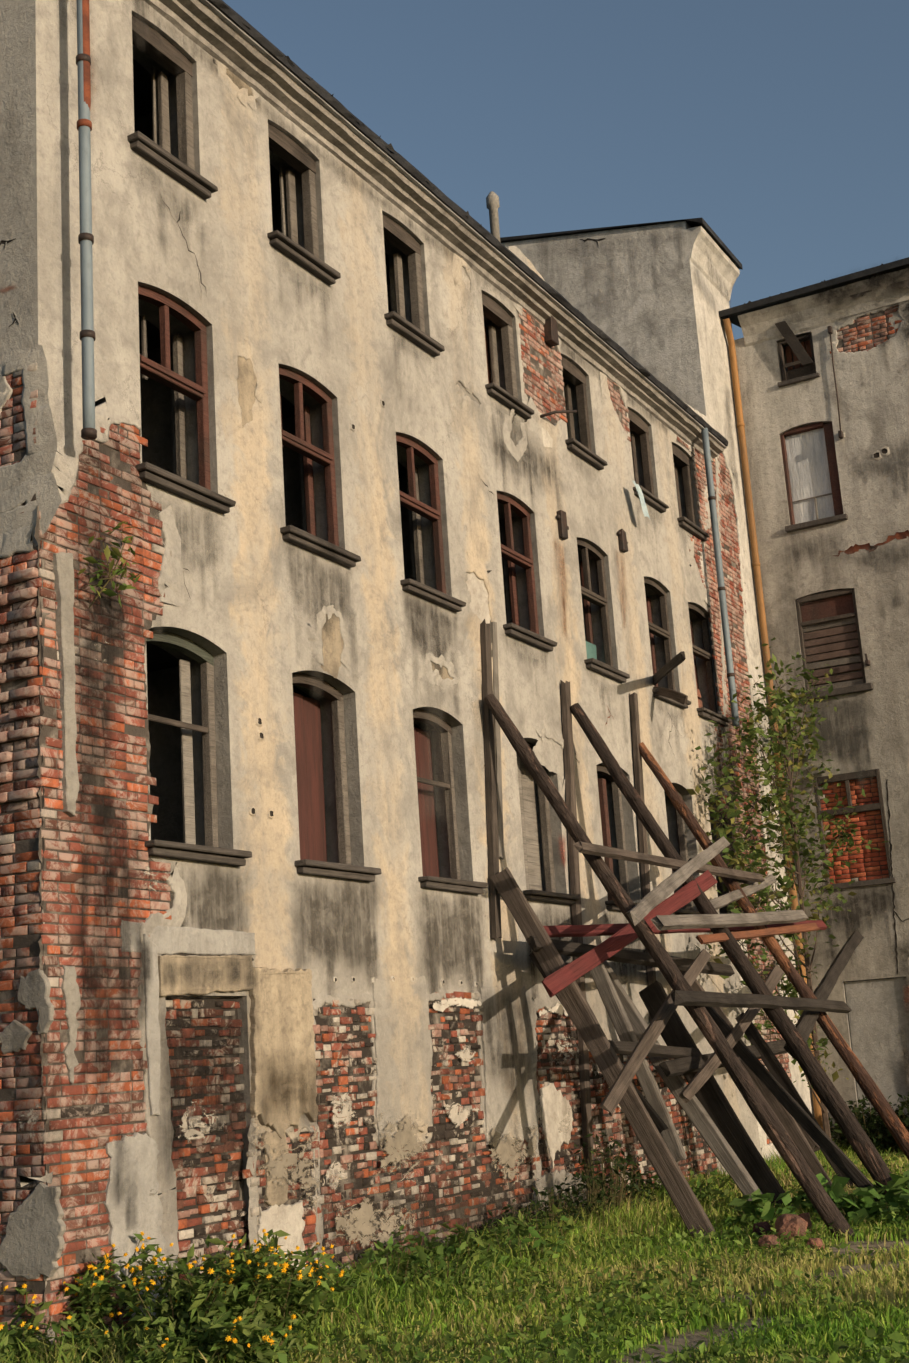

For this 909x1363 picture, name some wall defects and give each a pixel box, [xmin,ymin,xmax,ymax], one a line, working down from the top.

flaking render [509,246,545,281]
flaking render [500,300,568,466]
flaking render [820,301,909,372]
flaking render [676,436,775,913]
flaking render [0,334,661,1354]
crack [886,779,909,975]
flaking render [601,1026,722,1181]
flaking render [739,935,785,1011]
flaking render [740,976,799,1093]
flaking render [757,1121,784,1162]